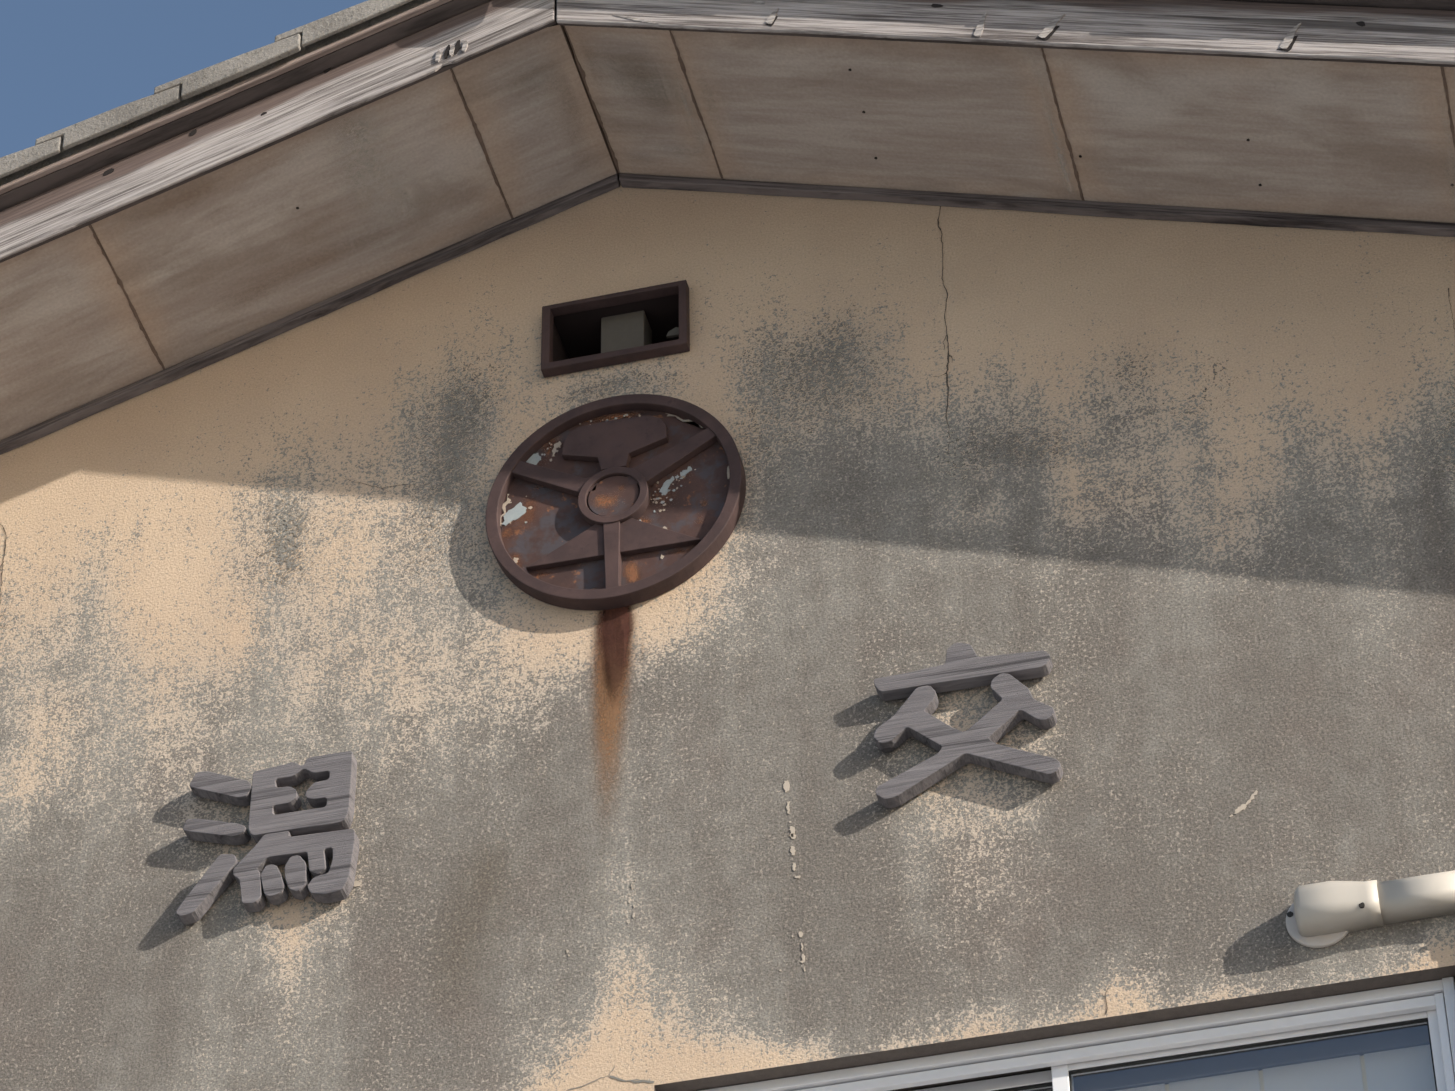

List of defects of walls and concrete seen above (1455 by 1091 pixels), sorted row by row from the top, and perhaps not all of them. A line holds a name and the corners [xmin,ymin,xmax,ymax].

crack [0,524,8,604]
leakage [248,483,318,590]
leakage [406,357,506,600]
leakage [556,365,686,409]
leakage [736,305,903,484]
crack [933,206,953,448]
leakage [936,415,1087,478]
rust [594,606,633,769]